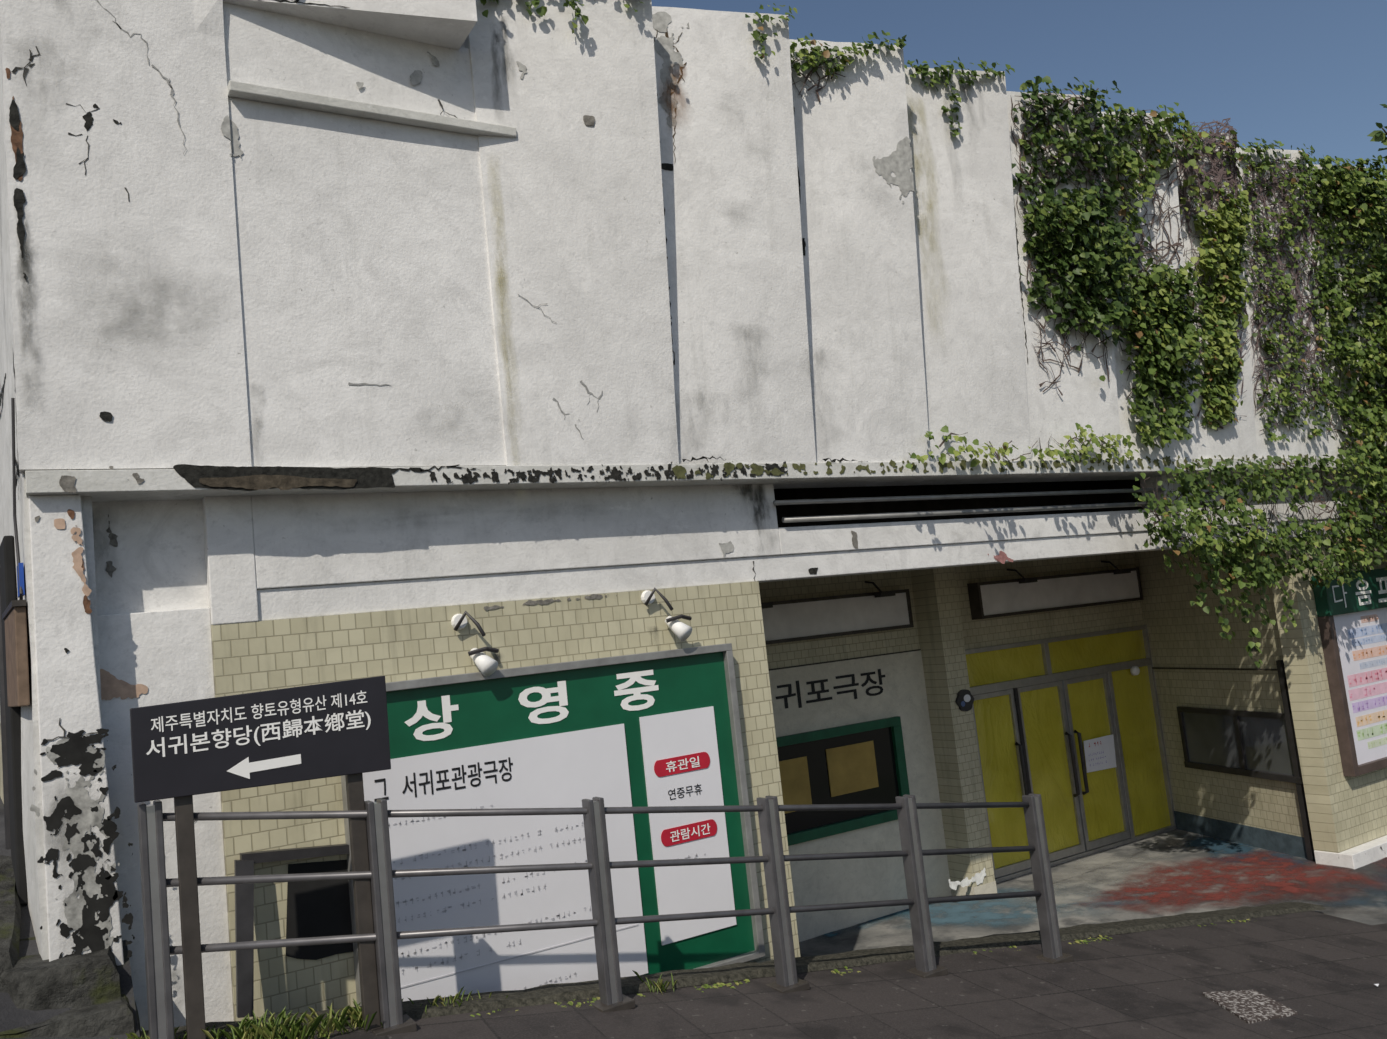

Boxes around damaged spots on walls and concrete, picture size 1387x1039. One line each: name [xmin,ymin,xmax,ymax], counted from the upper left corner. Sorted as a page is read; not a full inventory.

crack [12,46,40,86]
crack [96,0,187,154]
crack [66,103,100,175]
crack [654,30,687,365]
peeling [872,136,914,203]
peeling [59,469,77,492]
spalling [173,464,395,491]
peeling [35,509,92,614]
peeling [105,514,118,578]
peeling [100,669,148,700]
peeling [30,728,135,959]